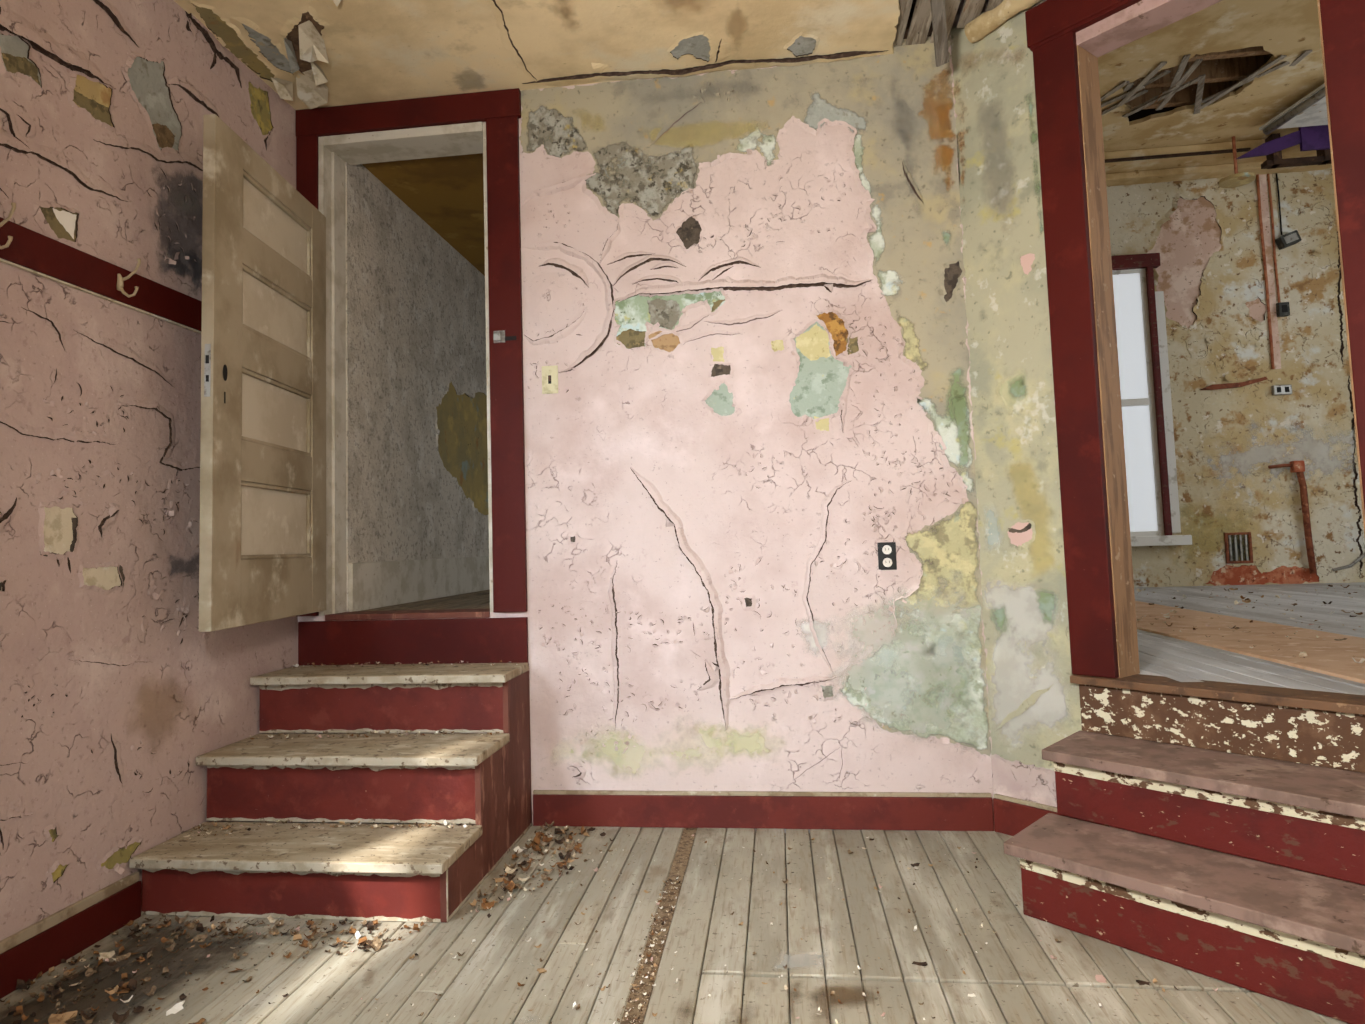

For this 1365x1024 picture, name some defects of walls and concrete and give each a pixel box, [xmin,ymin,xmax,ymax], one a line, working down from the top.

crack [167,11,242,119]
peeling [189,0,333,138]
crack [486,0,888,146]
crack [0,100,203,205]
peeling [67,52,196,265]
leakage [155,175,203,286]
crack [521,221,873,373]
peeling [1140,192,1271,393]
peeling [435,379,489,521]
peeling [519,0,1088,776]
crack [1336,231,1365,579]
crack [630,467,851,731]